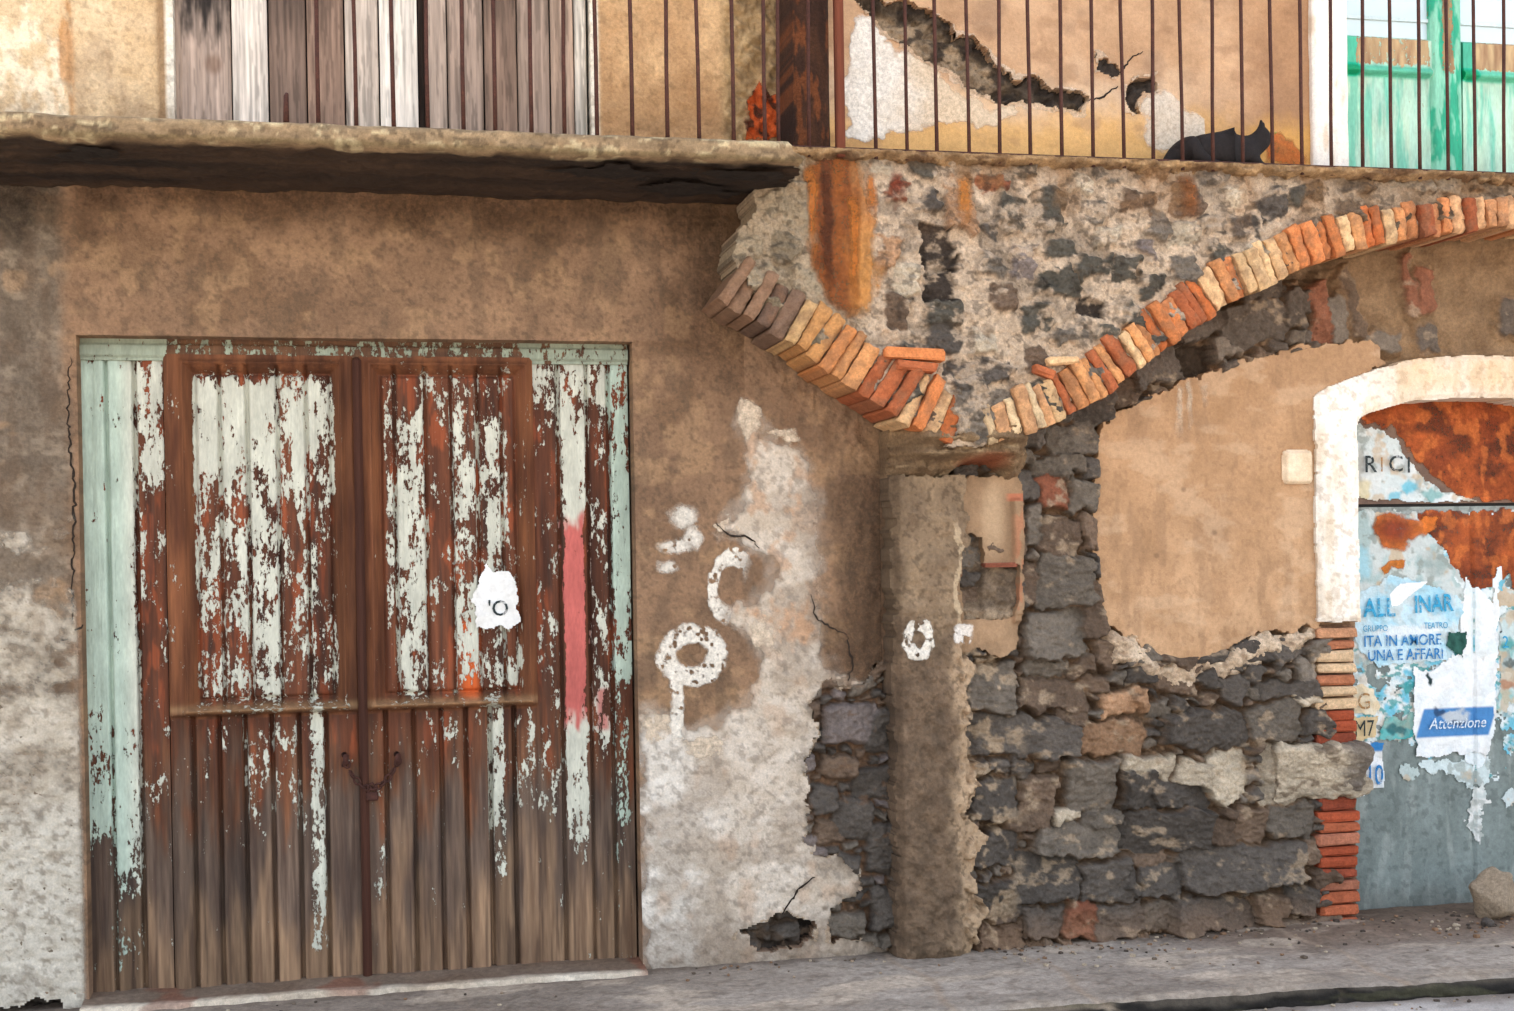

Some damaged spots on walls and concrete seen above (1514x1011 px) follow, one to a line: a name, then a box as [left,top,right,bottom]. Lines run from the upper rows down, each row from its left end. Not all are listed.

peeling [845,0,1089,142]
peeling [1094,49,1205,149]
corrosion [804,157,904,314]
corrosion [1362,401,1514,590]
flaking render [639,399,894,969]
crack [810,594,854,681]
spalling [1100,625,1316,687]